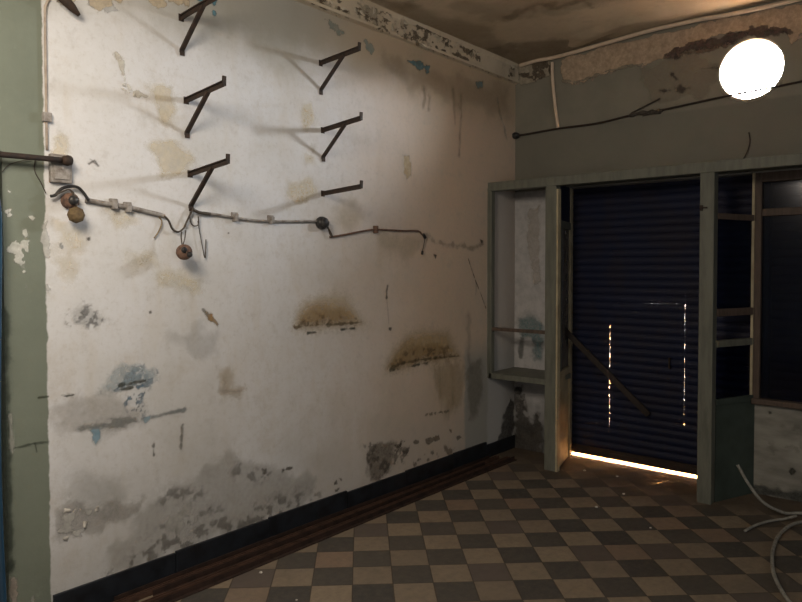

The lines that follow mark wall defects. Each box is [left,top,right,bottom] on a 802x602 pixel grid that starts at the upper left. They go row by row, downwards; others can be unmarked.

peeling [89,0,122,12]
peeling [311,0,483,70]
peeling [6,229,29,273]
peeling [41,222,50,258]
damp [80,367,153,444]
damp [498,387,544,453]
damp [368,442,407,481]